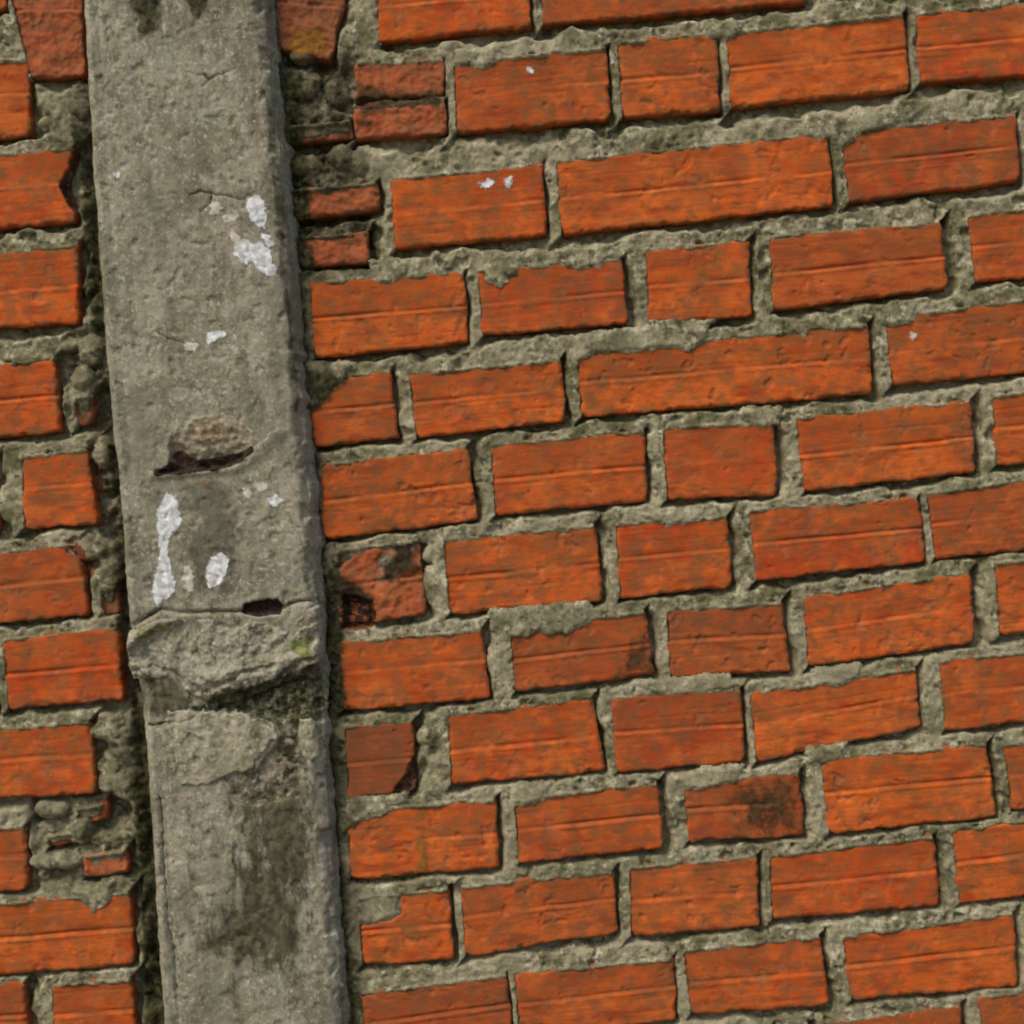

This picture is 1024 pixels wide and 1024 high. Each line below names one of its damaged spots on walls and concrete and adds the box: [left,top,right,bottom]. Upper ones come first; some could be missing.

spalling [153,413,256,476]
crack [129,596,321,627]
spalling [338,599,376,630]